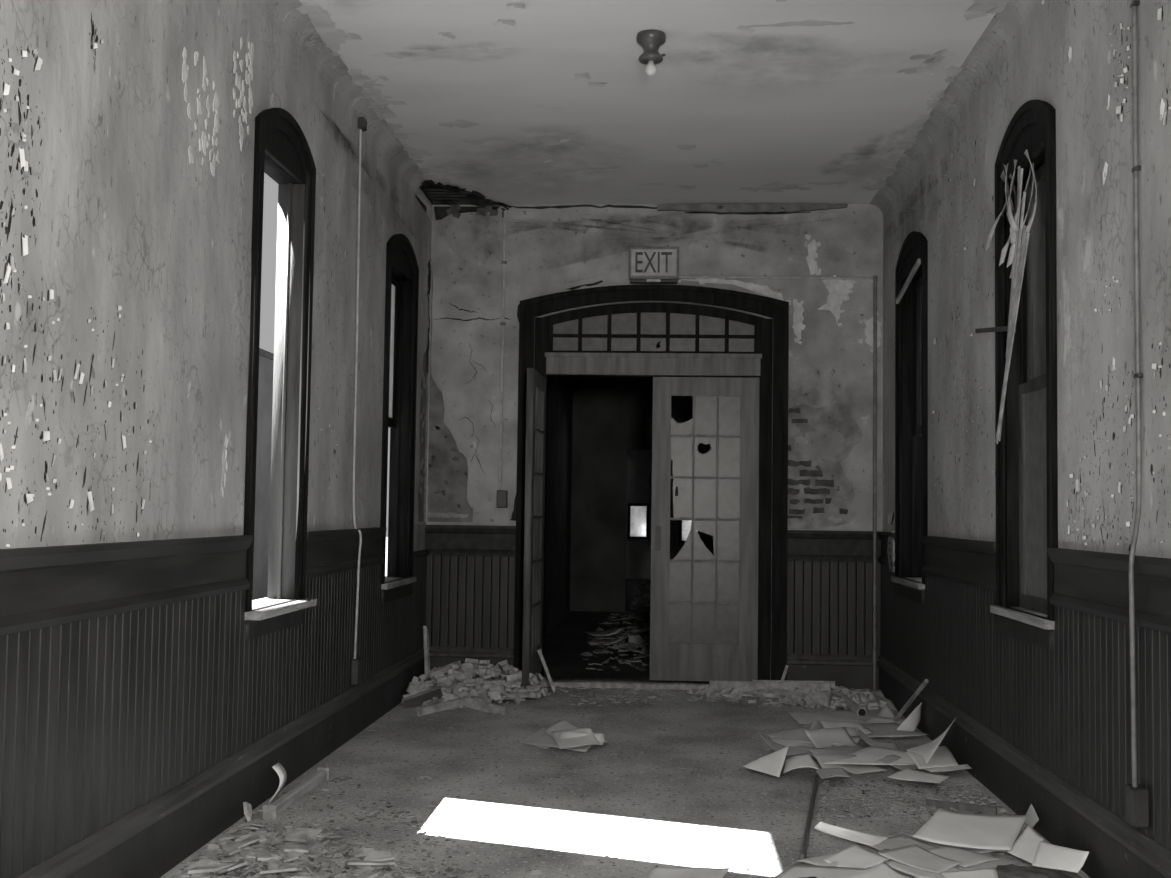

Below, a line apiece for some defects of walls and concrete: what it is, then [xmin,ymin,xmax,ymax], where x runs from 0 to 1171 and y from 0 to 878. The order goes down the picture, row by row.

peeling [89,13,103,56]
peeling [182,47,220,177]
peeling [233,37,254,152]
peeling [347,68,511,218]
peeling [1160,89,1171,125]
peeling [0,46,154,547]
spalling [413,274,476,551]
peeling [678,234,856,344]
peeling [858,312,882,352]
peeling [1151,338,1171,387]